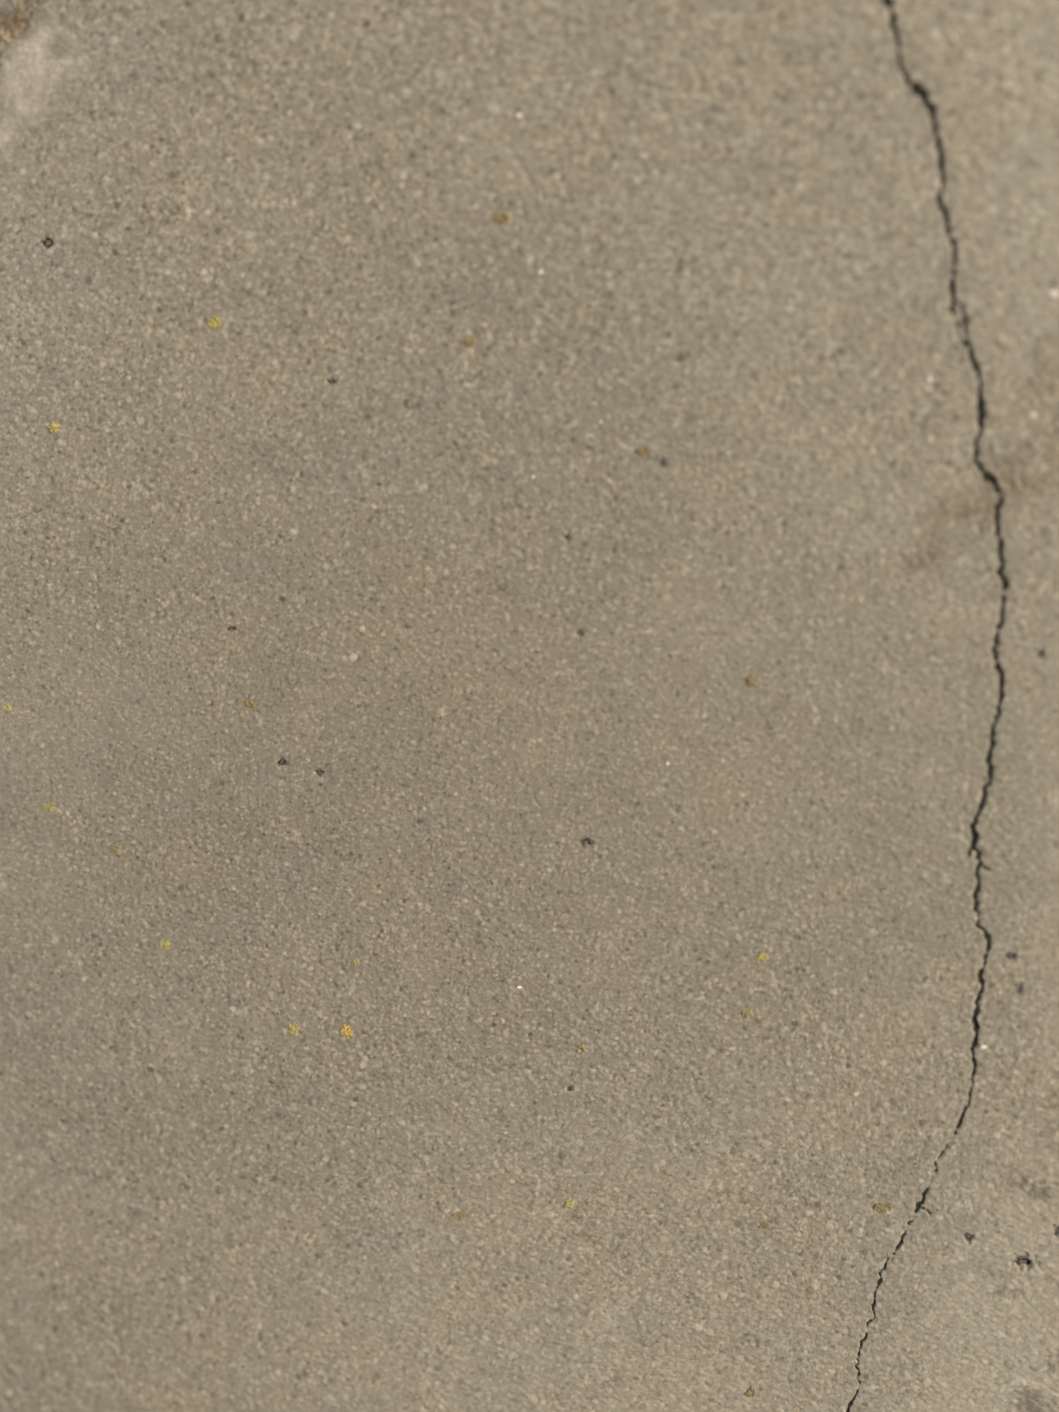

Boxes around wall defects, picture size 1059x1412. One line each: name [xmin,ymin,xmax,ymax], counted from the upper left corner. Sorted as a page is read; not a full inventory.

crack [846,0,1009,1412]